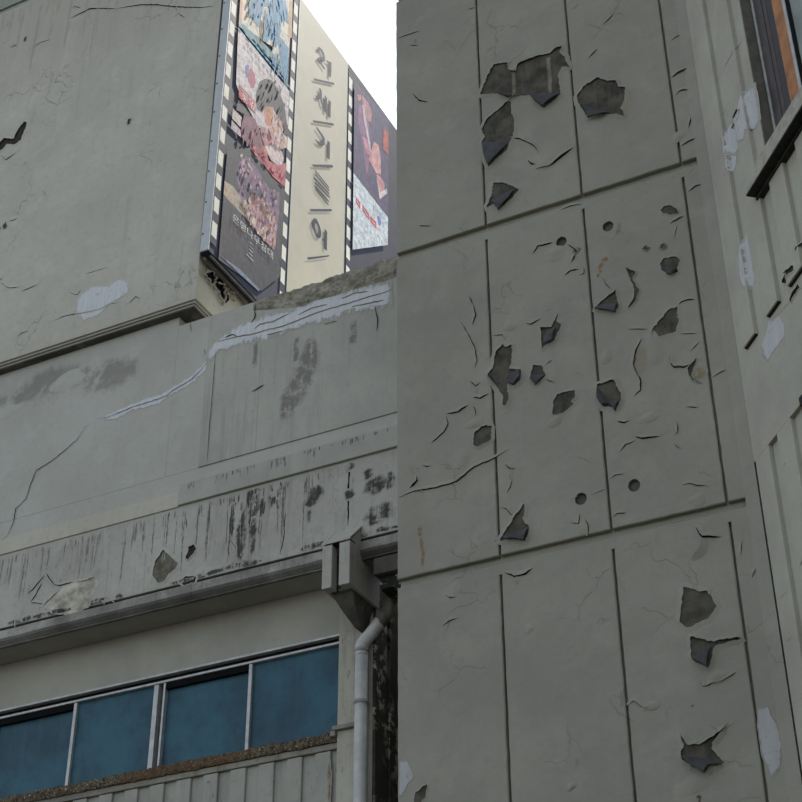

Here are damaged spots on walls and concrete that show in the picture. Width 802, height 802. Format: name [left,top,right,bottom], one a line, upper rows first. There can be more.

crack [72,3,214,18]
peeling [0,120,30,153]
peeling [477,44,630,170]
peeling [483,180,523,214]
spalling [253,256,400,310]
water stain [104,280,394,425]
peeling [485,341,548,409]
crack [8,429,84,534]
water stain [299,473,326,553]
water stain [342,463,398,538]
peeling [149,544,198,587]
peeling [675,583,746,673]